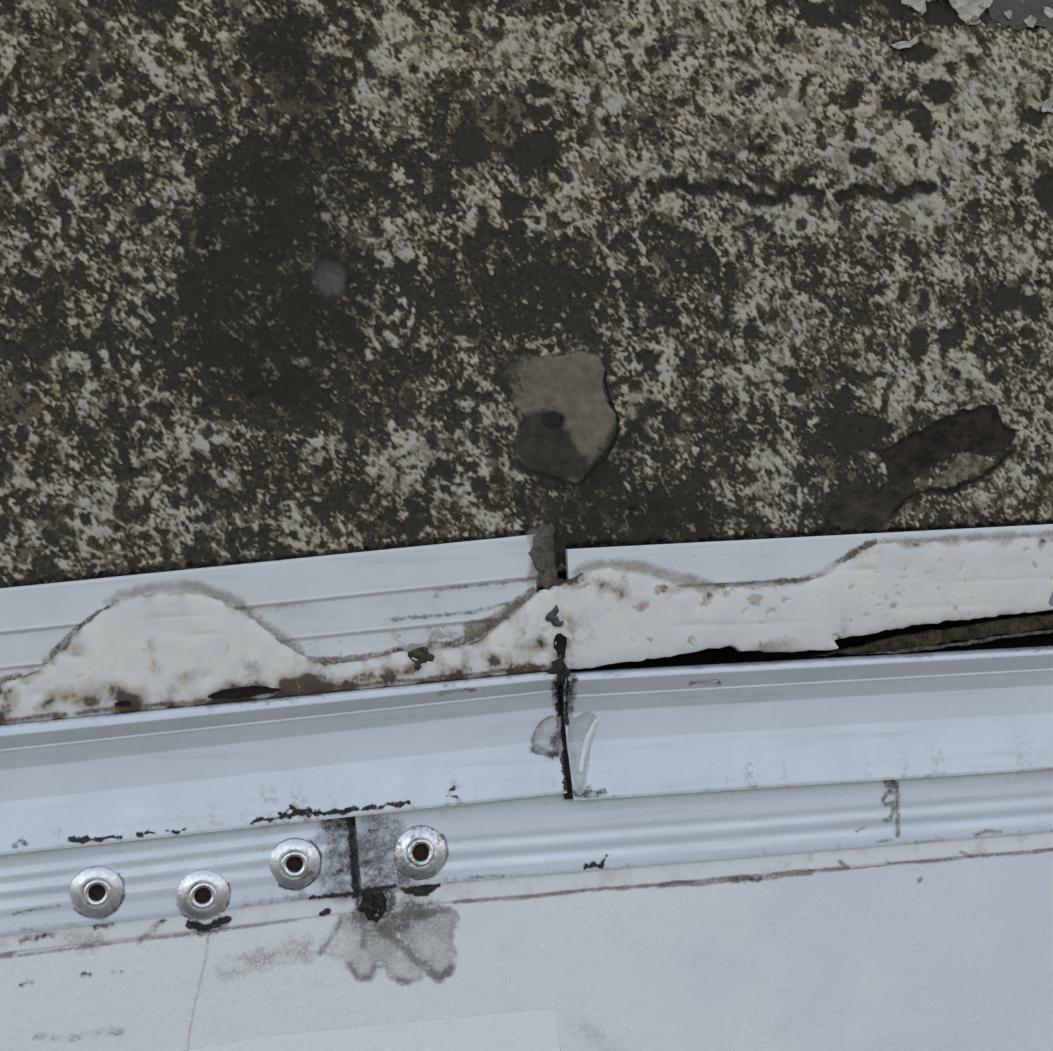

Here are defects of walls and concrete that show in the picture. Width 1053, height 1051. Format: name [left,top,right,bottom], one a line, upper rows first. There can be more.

peeling [891,35,919,49]
peeling [901,0,1053,34]
spalling [510,351,621,487]
spalling [813,404,1020,536]
leakage [68,835,123,844]
leakage [250,800,459,979]